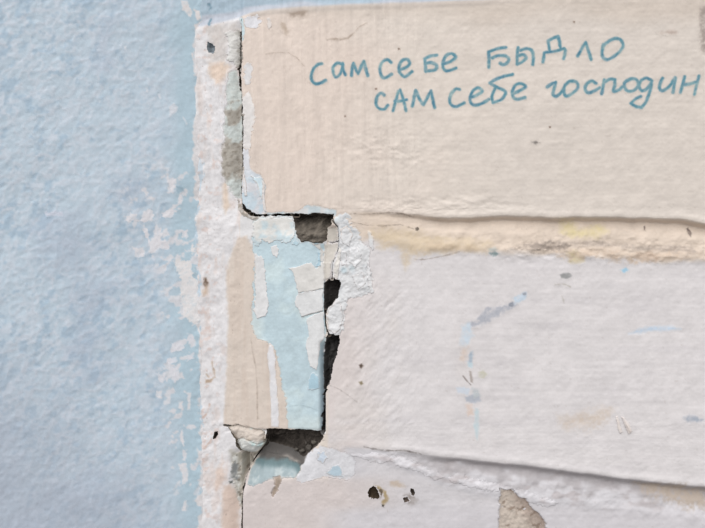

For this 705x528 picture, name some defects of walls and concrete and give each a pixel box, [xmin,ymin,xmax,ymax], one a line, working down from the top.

crack [236,19,244,167]
peeling [122,178,186,259]
peeling [220,14,374,431]
peeling [154,229,200,399]
crack [223,199,415,528]
peeling [232,445,356,507]
spalling [498,488,546,528]